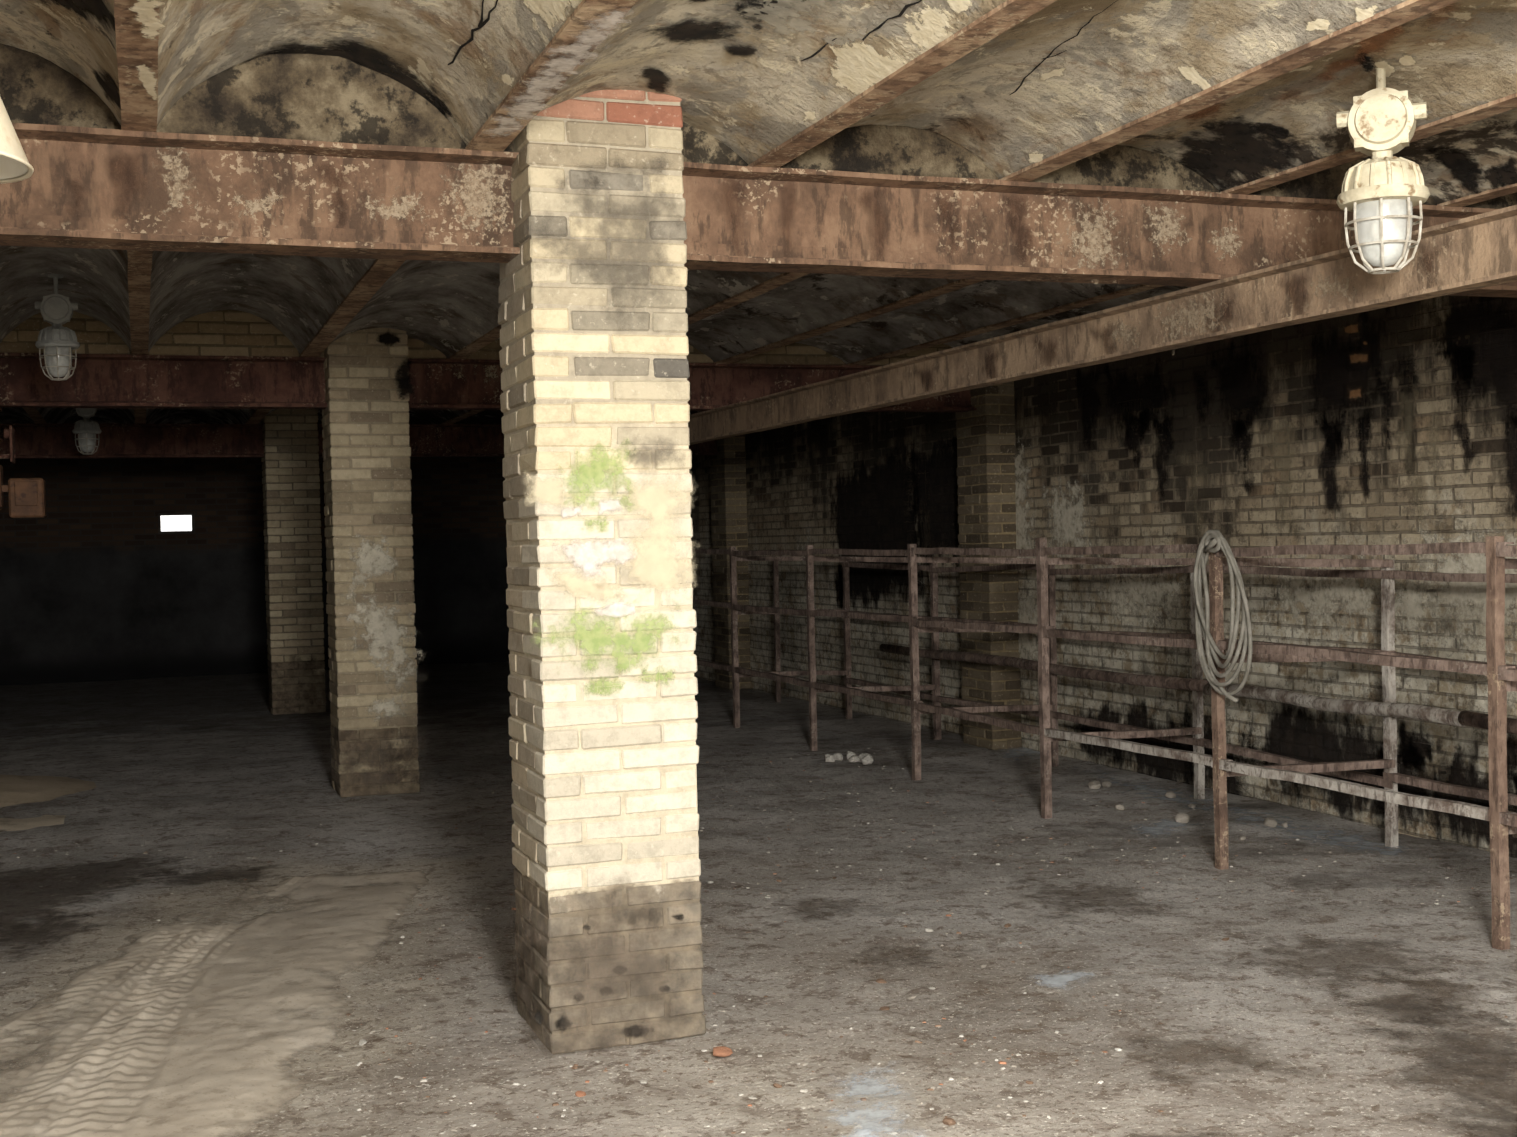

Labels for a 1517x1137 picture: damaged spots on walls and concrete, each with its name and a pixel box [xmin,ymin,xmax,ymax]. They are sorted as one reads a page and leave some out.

peeling [129,0,165,40]
crack [447,0,498,65]
peeling [738,0,971,95]
peeling [1177,66,1211,90]
peeling [1306,19,1330,31]
peeling [1355,5,1377,22]
rust [1011,200,1031,255]
rust [1289,279,1306,313]
damp [1122,410,1174,497]
damp [1315,355,1418,510]
damp [1445,344,1476,473]
damp [1505,415,1517,517]